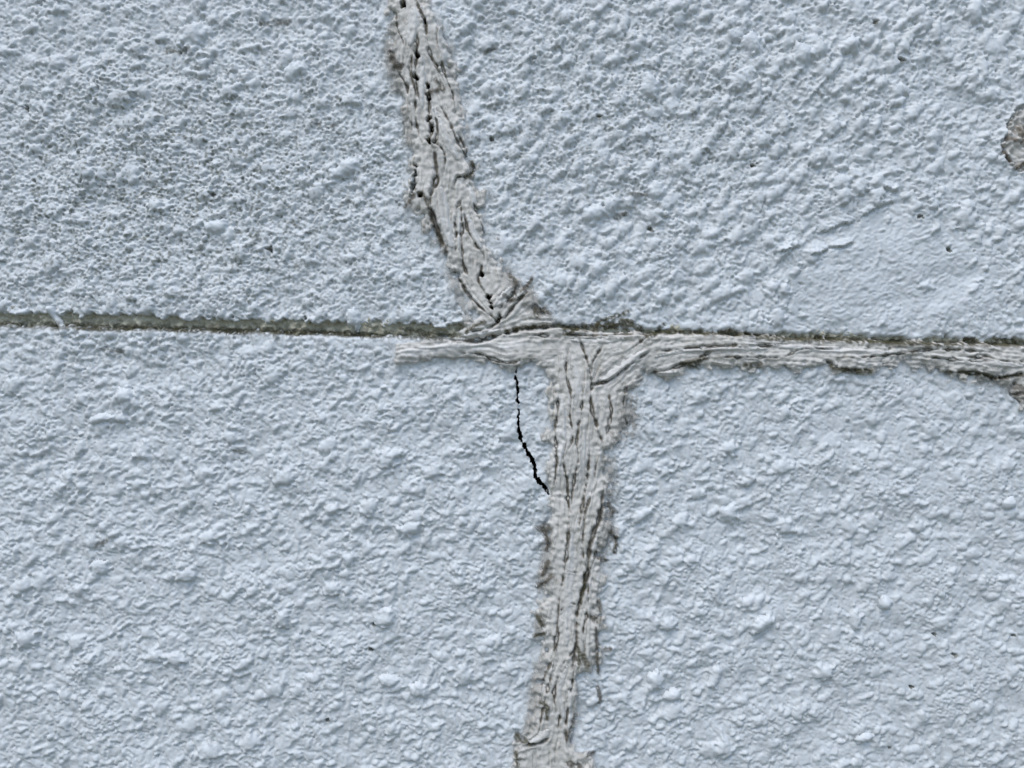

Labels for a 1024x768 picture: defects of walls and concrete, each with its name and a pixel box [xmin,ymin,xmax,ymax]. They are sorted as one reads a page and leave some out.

crack [514,367,549,495]